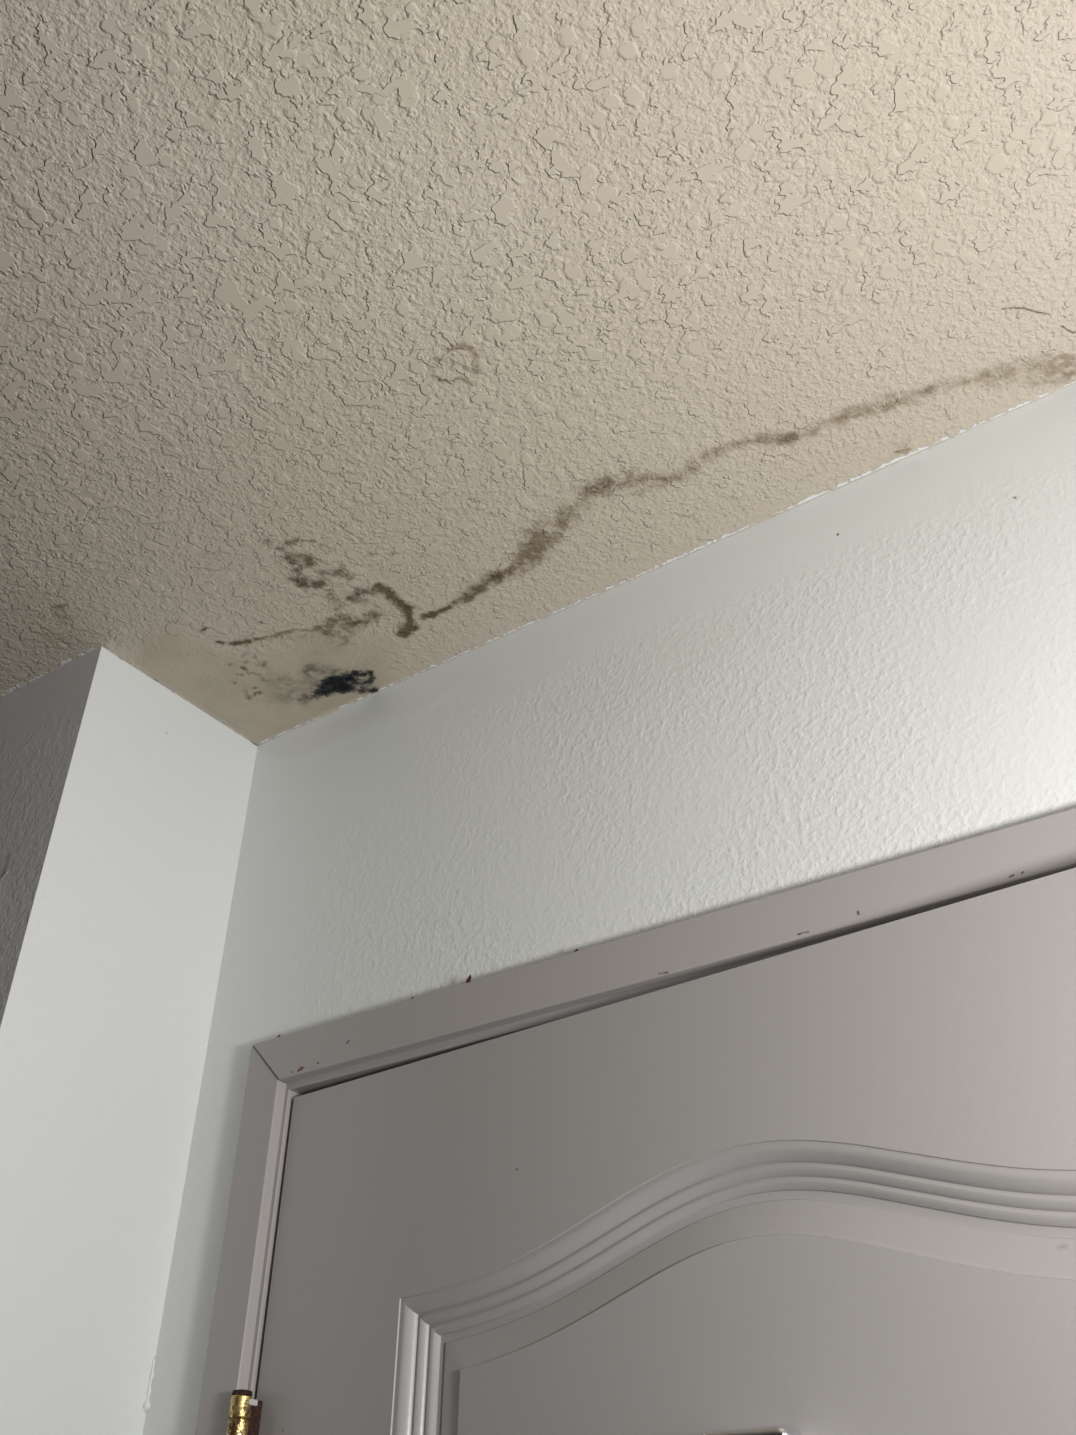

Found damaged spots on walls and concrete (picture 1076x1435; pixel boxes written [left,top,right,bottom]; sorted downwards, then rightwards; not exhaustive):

water stain [736,429,817,445]
water stain [202,519,568,646]
water stain [302,666,378,702]